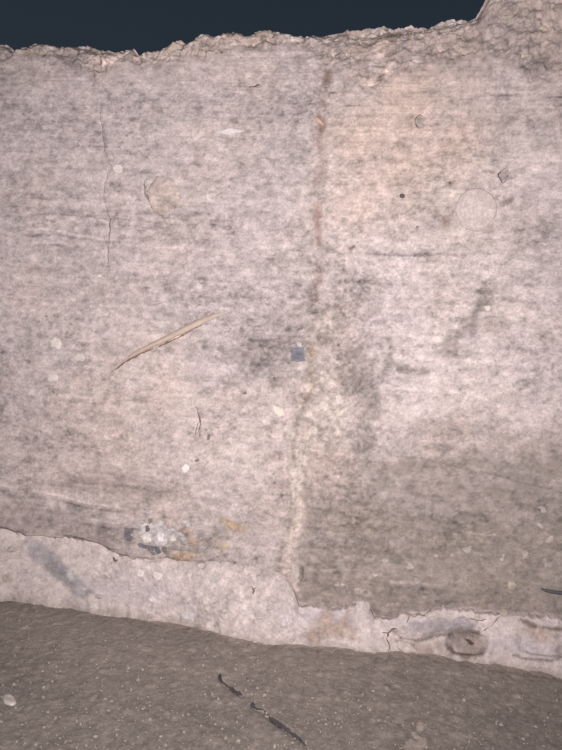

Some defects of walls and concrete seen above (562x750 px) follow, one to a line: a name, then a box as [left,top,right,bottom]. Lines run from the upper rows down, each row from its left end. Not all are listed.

crack [95,111,111,262]
spalling [0,519,562,680]
crack [415,631,452,641]